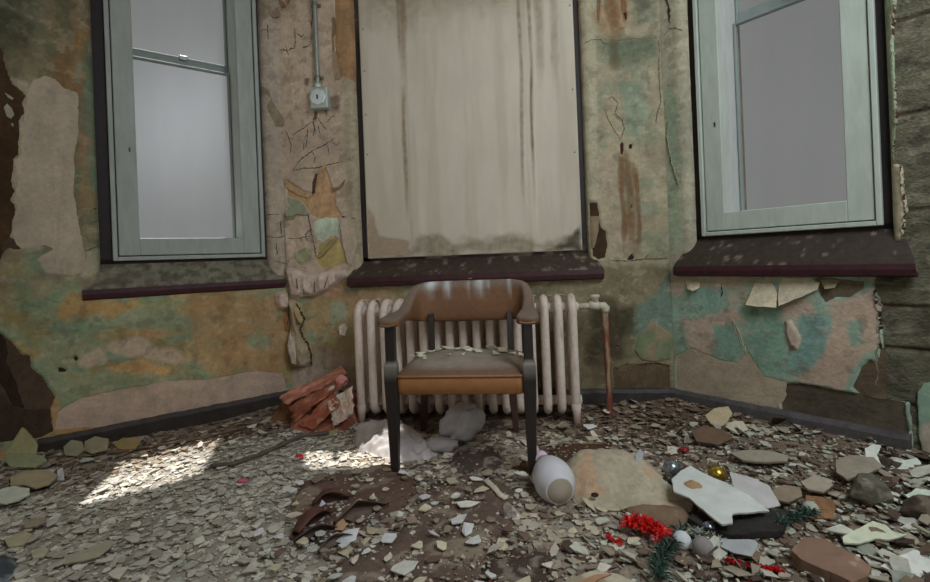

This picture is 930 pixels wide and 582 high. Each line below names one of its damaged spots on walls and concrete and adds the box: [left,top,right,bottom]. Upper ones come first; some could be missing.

crack [260,11,313,56]
peeling [331,0,357,83]
peeling [0,48,87,275]
peeling [260,86,284,126]
crack [285,114,342,171]
crack [583,0,684,185]
peeling [283,164,357,269]
damp [369,217,411,256]
damp [557,231,580,250]
spalling [613,0,930,450]
crack [287,303,313,366]
peeling [0,333,287,442]